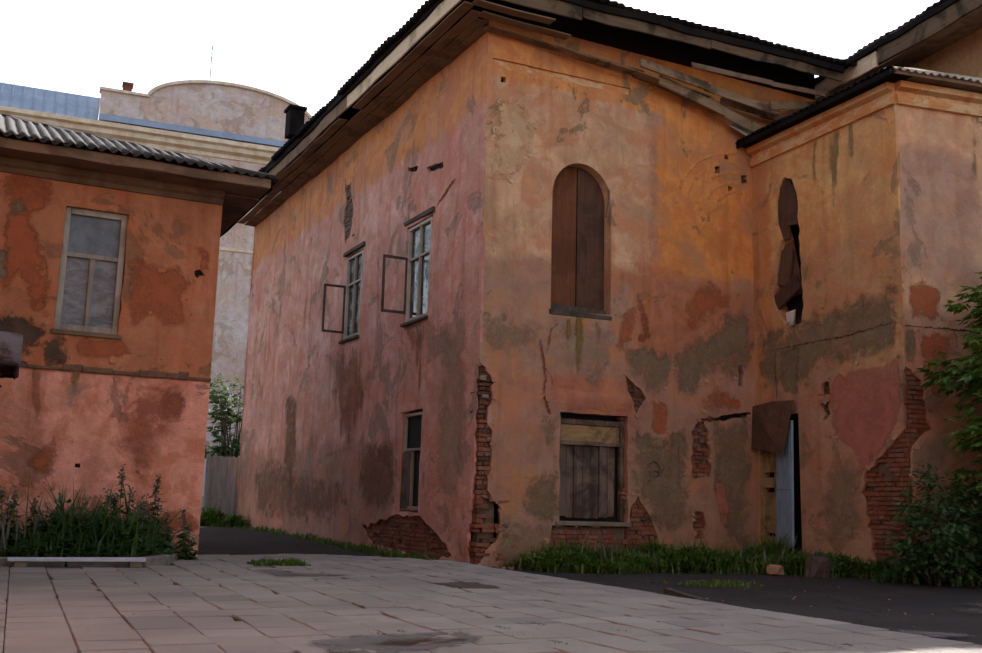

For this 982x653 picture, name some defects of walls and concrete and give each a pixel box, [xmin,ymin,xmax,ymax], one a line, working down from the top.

crack [540,323,558,414]
flaking render [360,509,455,560]
flaking render [468,365,519,569]
flaking render [524,473,657,552]
crack [701,412,747,421]
flaking render [615,277,949,567]